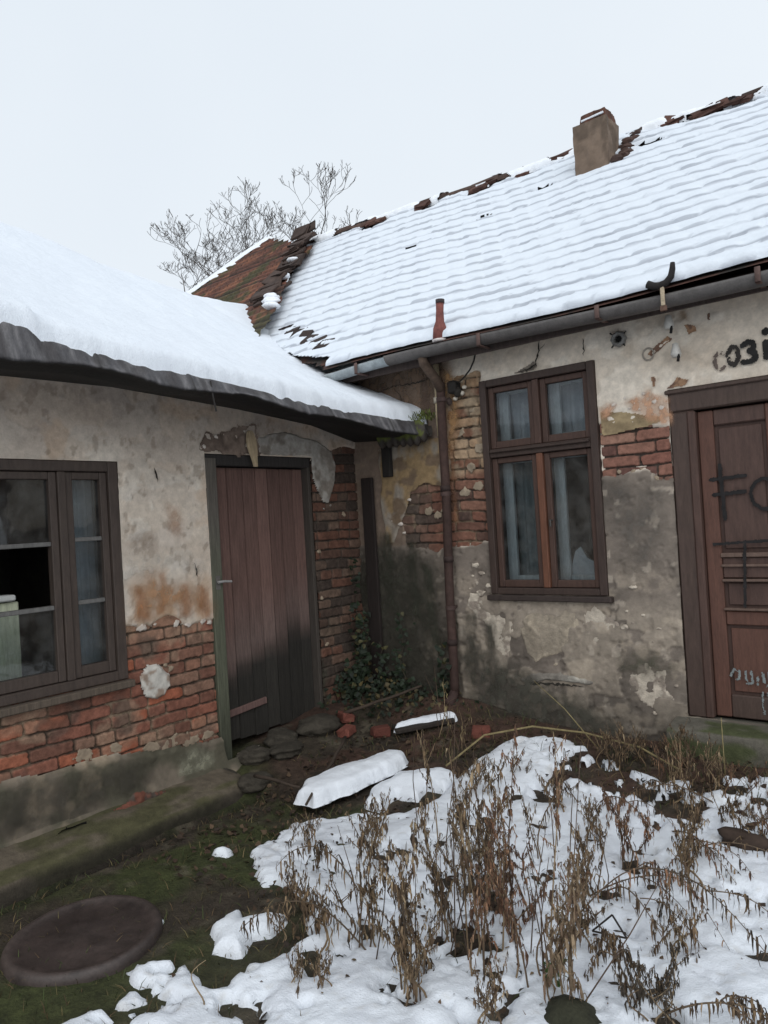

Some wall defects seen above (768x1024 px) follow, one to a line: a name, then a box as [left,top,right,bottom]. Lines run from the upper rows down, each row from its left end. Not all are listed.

flaking render [199,424,261,457]
flaking render [378,370,488,552]
flaking render [600,377,688,480]
flaking render [0,615,219,784]
damp [463,614,616,738]
flaking render [619,663,678,716]